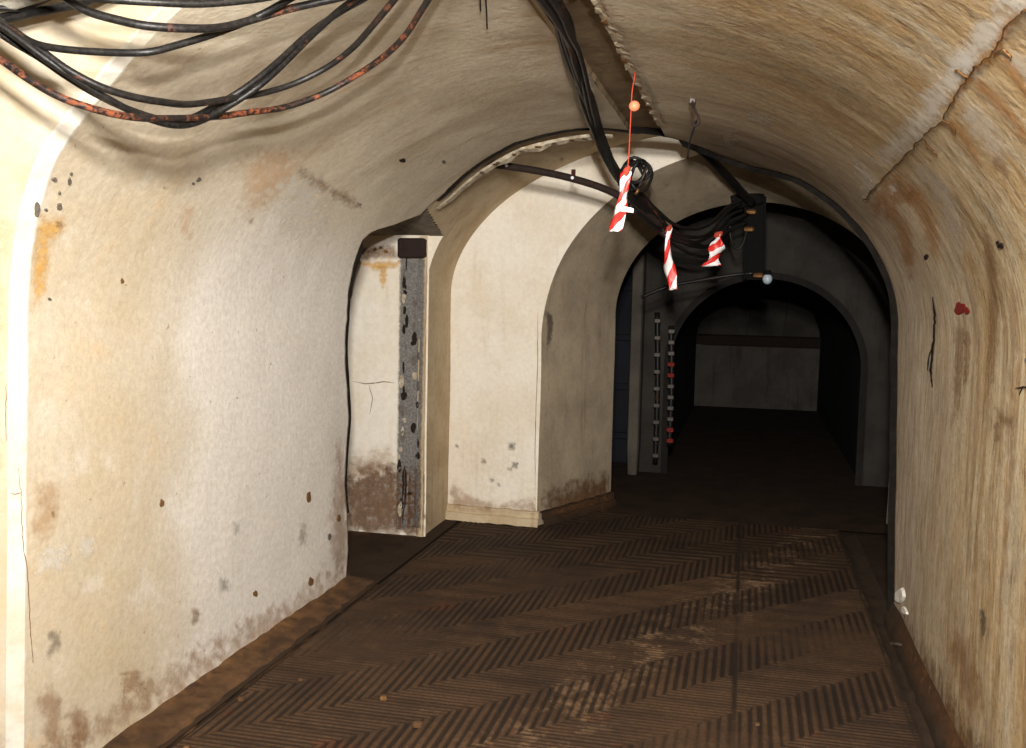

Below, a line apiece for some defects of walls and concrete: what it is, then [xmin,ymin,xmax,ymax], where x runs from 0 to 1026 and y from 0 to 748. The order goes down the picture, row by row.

crack [862,9,1026,200]
water stain [347,466,423,536]